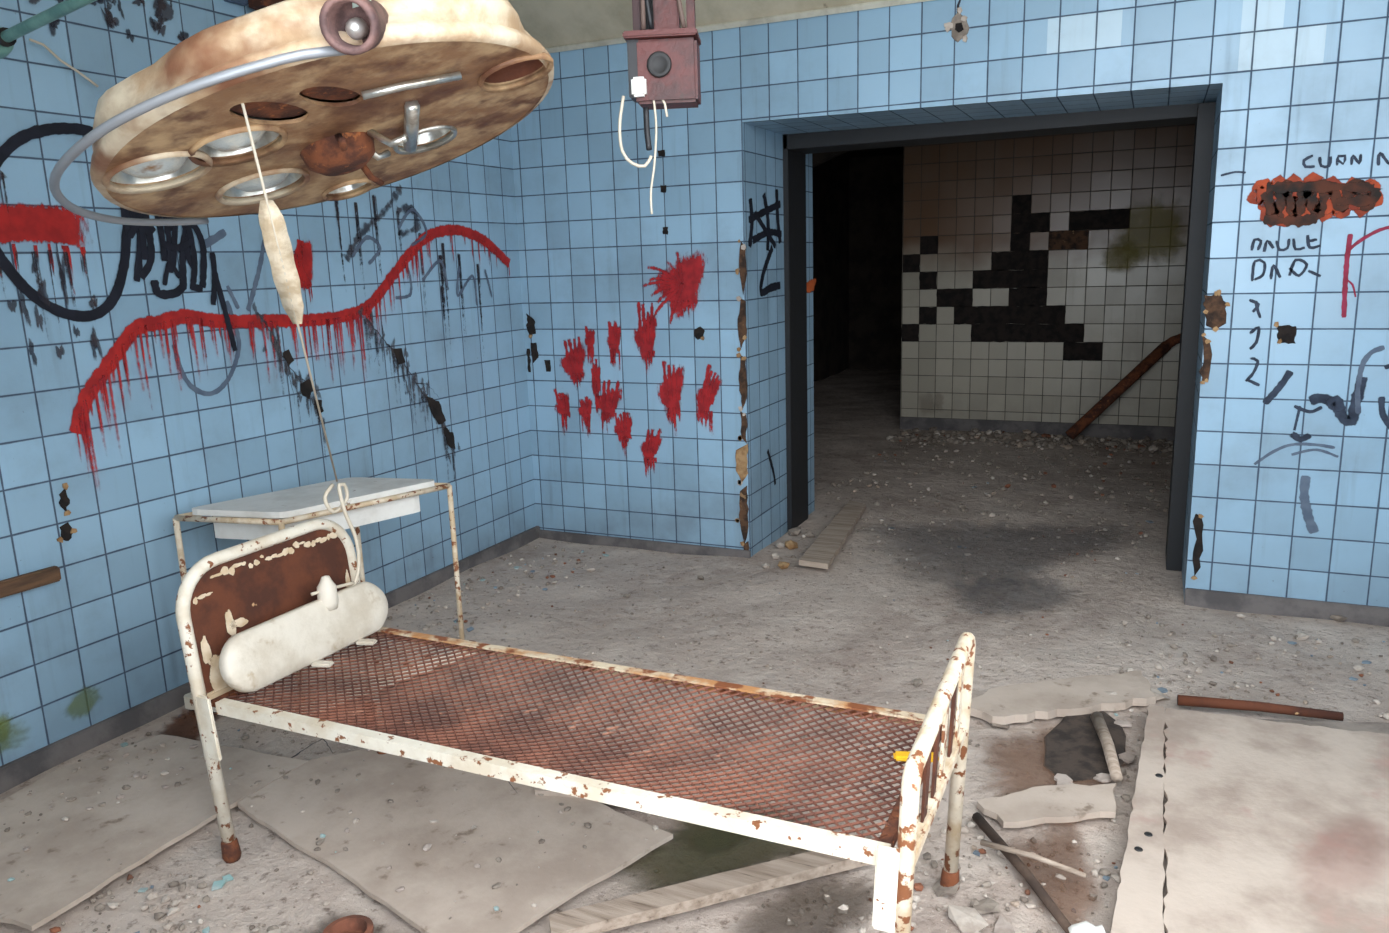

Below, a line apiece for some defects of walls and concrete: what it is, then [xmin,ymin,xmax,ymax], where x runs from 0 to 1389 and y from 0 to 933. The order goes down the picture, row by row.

spalling [944,0,969,42]
spalling [1199,289,1230,384]
peeling [735,239,749,550]
spalling [1044,711,1137,785]
water stain [629,821,809,890]